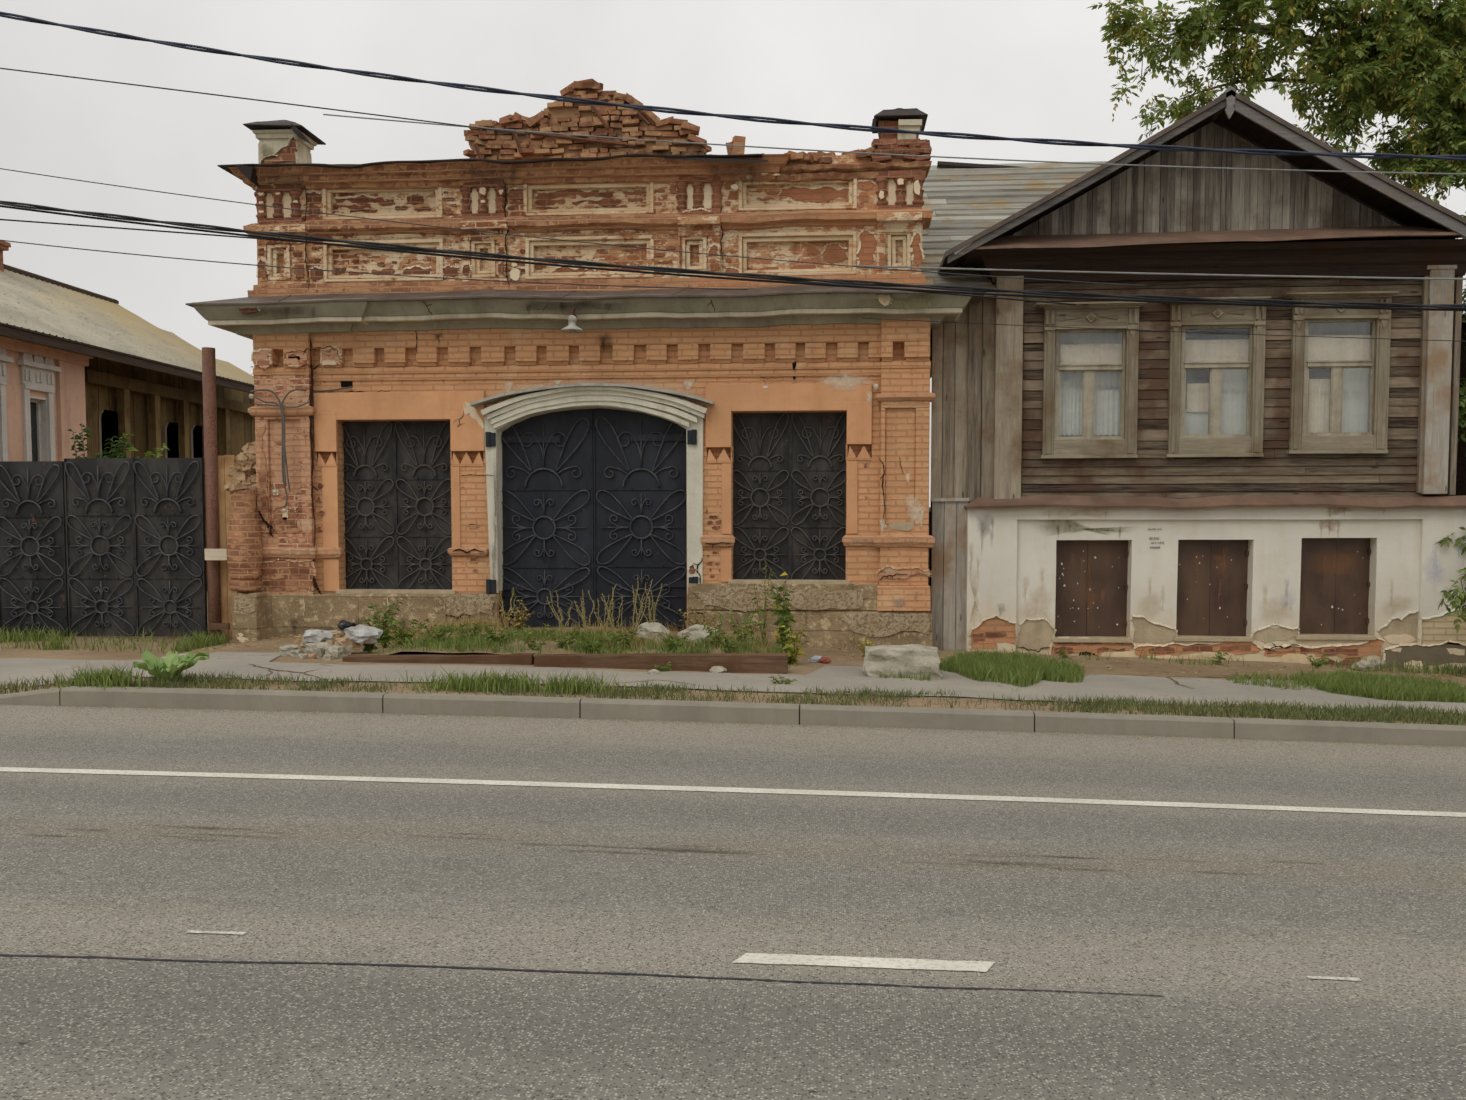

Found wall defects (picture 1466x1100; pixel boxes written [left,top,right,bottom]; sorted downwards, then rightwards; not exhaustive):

peeling [481,173,884,215]
peeling [498,245,682,280]
peeling [706,226,885,273]
peeling [909,231,925,267]
spalling [968,607,1466,669]